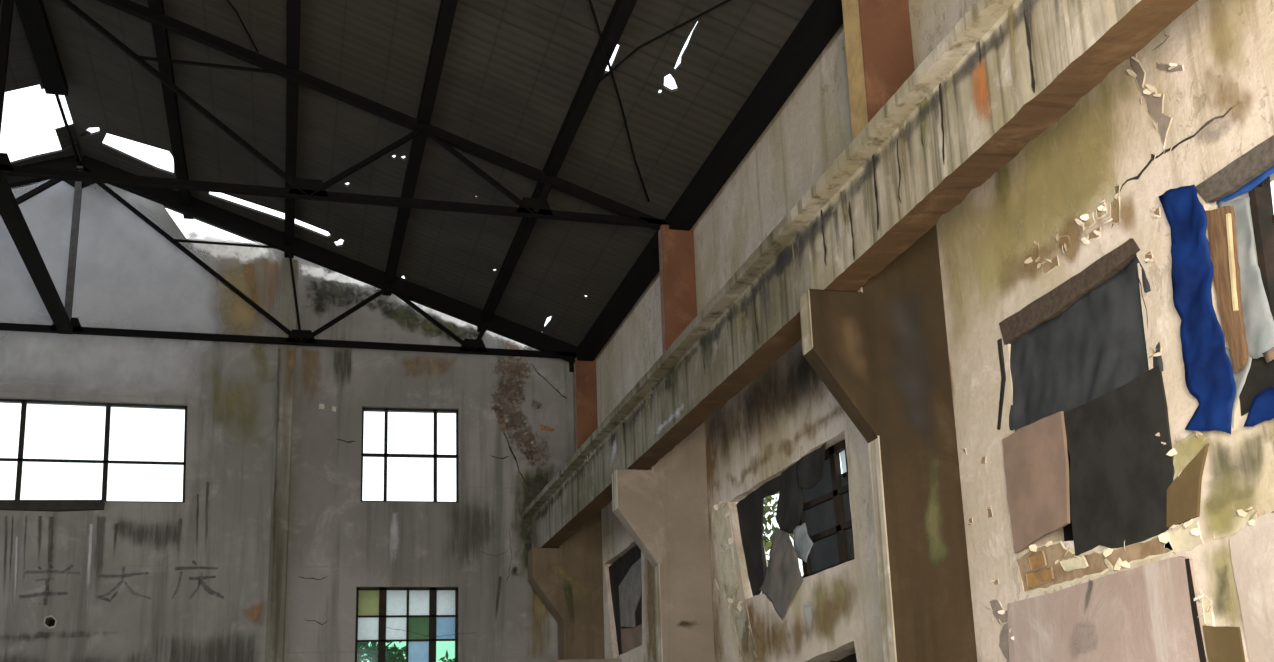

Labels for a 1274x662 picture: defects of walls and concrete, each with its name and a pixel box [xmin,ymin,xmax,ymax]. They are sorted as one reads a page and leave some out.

damp [953,0,1032,95]
peeling [1127,53,1185,150]
crack [1111,106,1234,229]
damp [701,156,877,359]
peeling [1024,193,1121,275]
peeling [1156,431,1208,481]
damp [4,516,53,585]
damp [88,517,182,582]
damp [496,451,598,618]
spalling [1016,506,1258,594]
peeling [985,579,1014,662]
peeling [1194,588,1215,626]